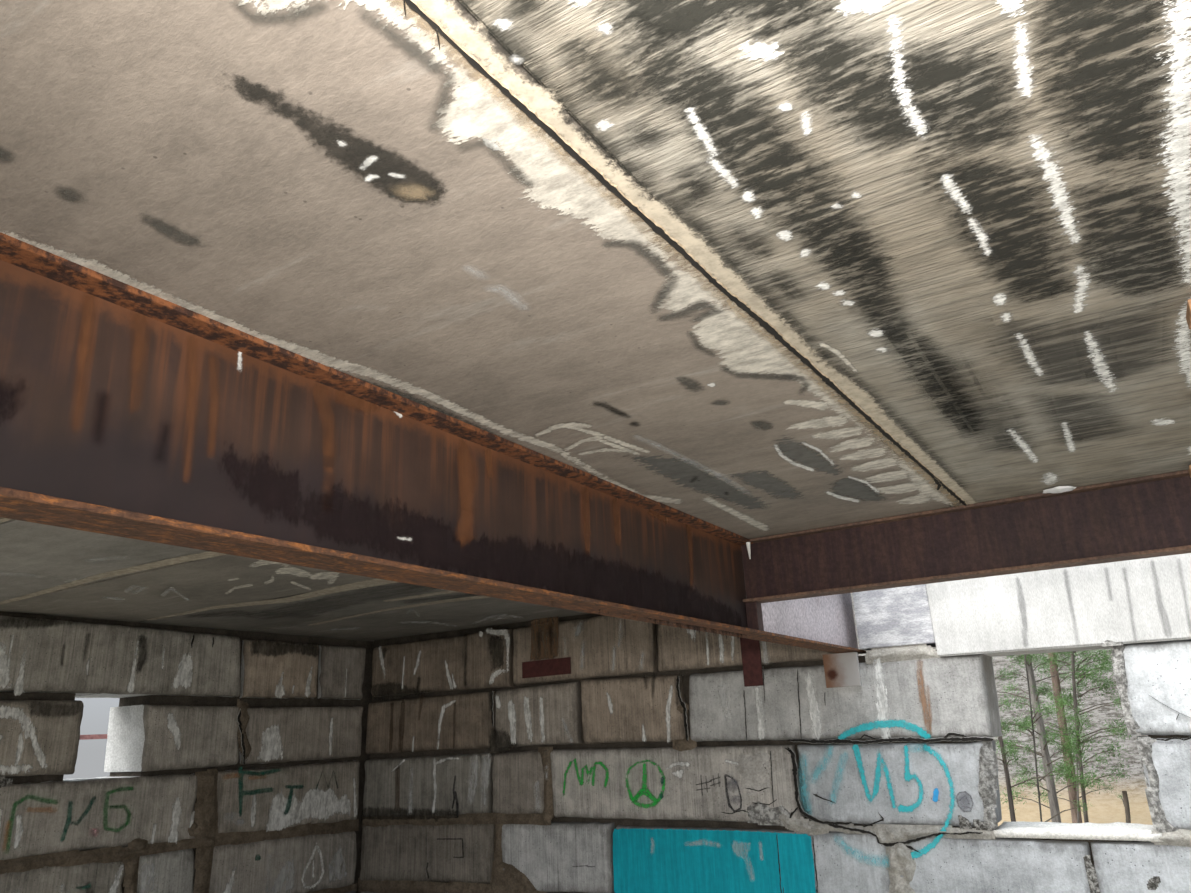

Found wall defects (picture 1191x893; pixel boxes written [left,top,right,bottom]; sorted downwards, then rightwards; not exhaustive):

damp [237,0,322,21]
damp [235,76,445,207]
damp [339,0,1191,507]
crack [676,676,689,741]
crack [1149,695,1191,741]
crack [721,670,993,893]
spalling [490,824,547,893]